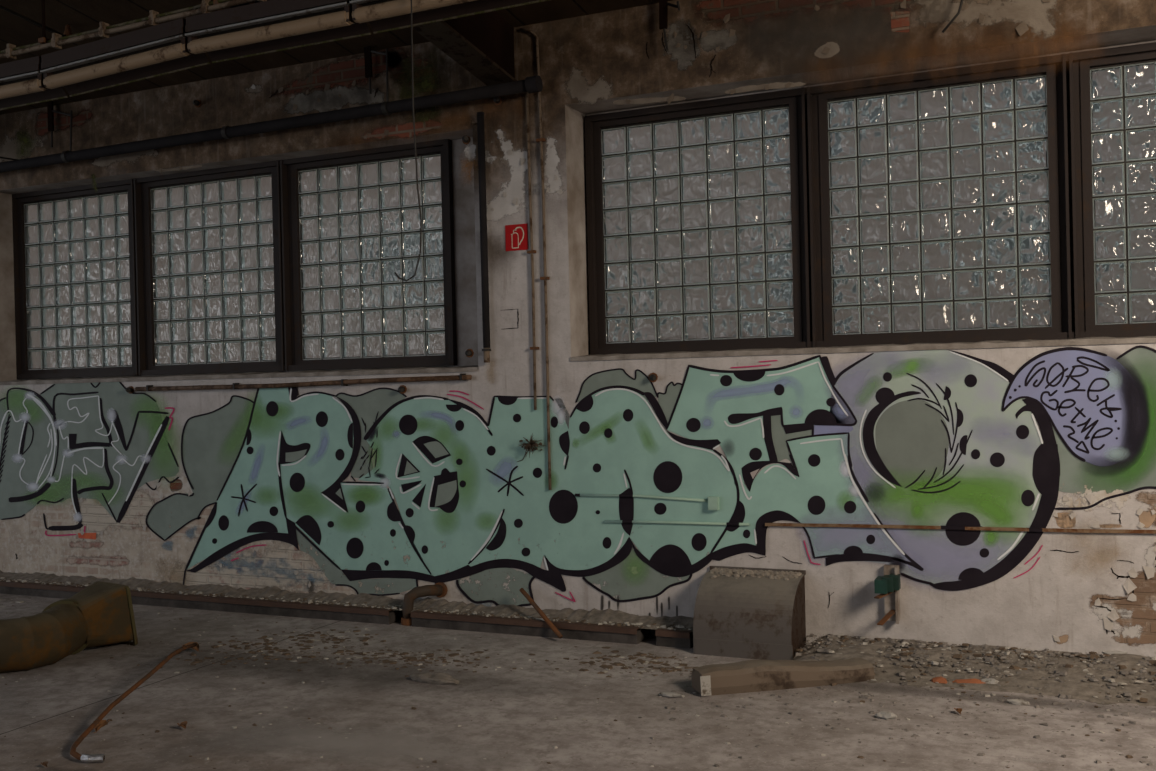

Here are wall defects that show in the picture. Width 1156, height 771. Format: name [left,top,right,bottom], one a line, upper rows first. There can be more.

spalling [663,19,737,71]
spalling [814,42,840,58]
peeling [890,0,1061,39]
peeling [464,129,565,222]
peeling [1053,483,1156,529]
flaking render [1090,543,1156,646]